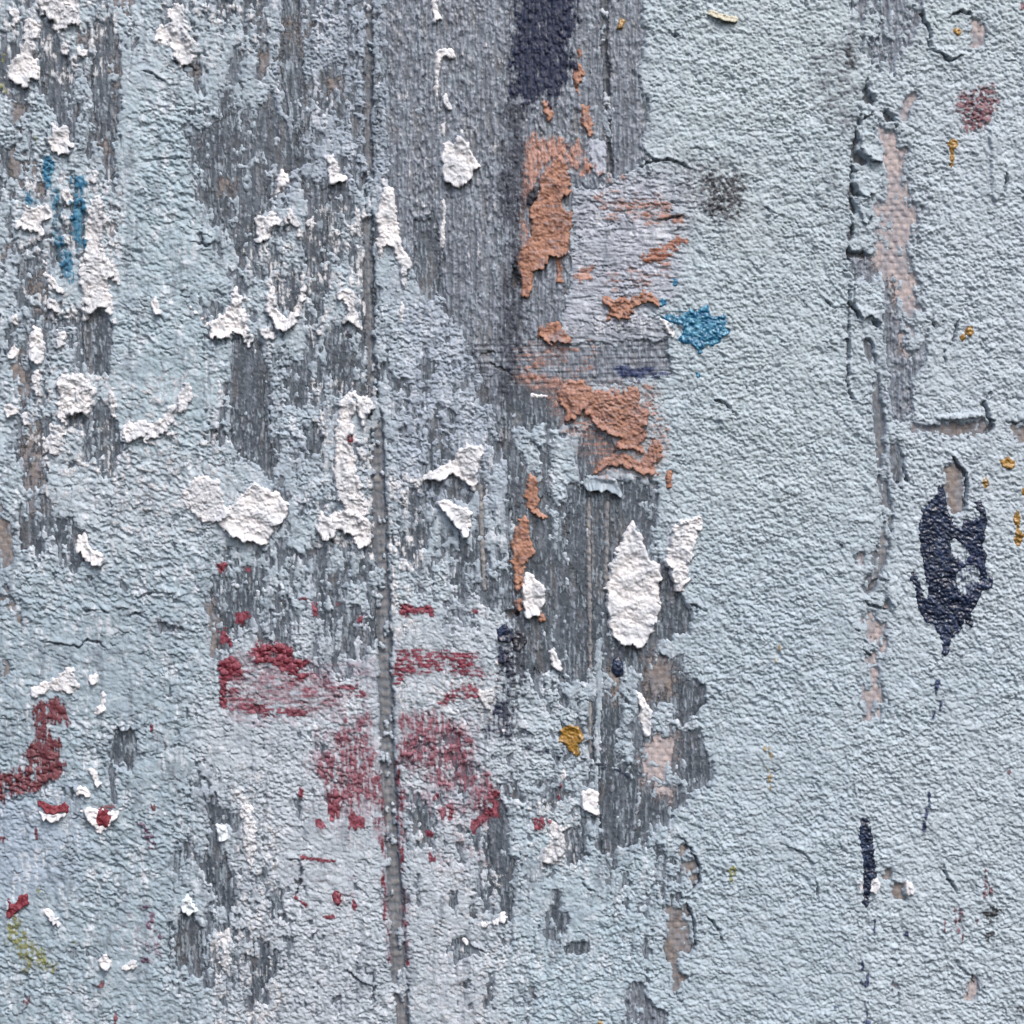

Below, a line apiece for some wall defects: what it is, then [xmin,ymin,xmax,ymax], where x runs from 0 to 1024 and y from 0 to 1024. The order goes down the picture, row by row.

peeling [0,0,139,593]
peeling [846,85,924,358]
peeling [158,0,713,1024]
peeling [889,443,904,483]
peeling [857,601,889,721]